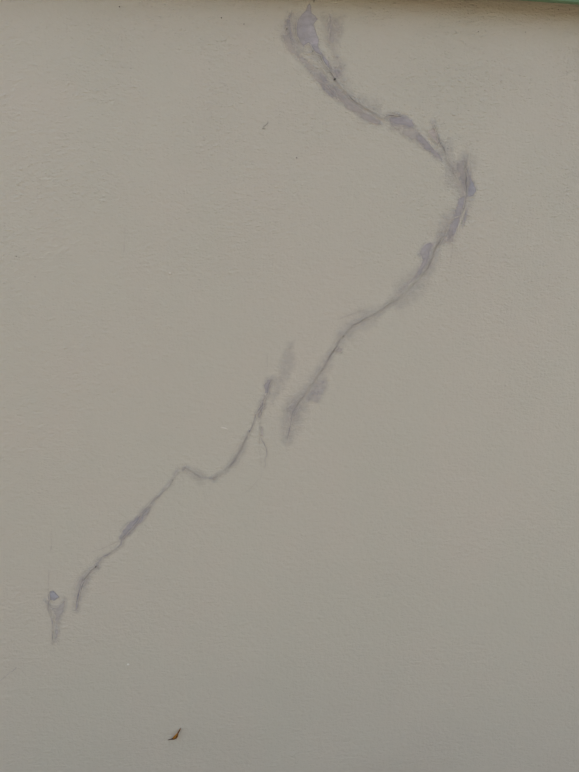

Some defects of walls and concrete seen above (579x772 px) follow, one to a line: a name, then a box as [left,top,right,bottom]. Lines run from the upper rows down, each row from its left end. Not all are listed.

crack [287,22,468,439]
crack [76,366,273,609]